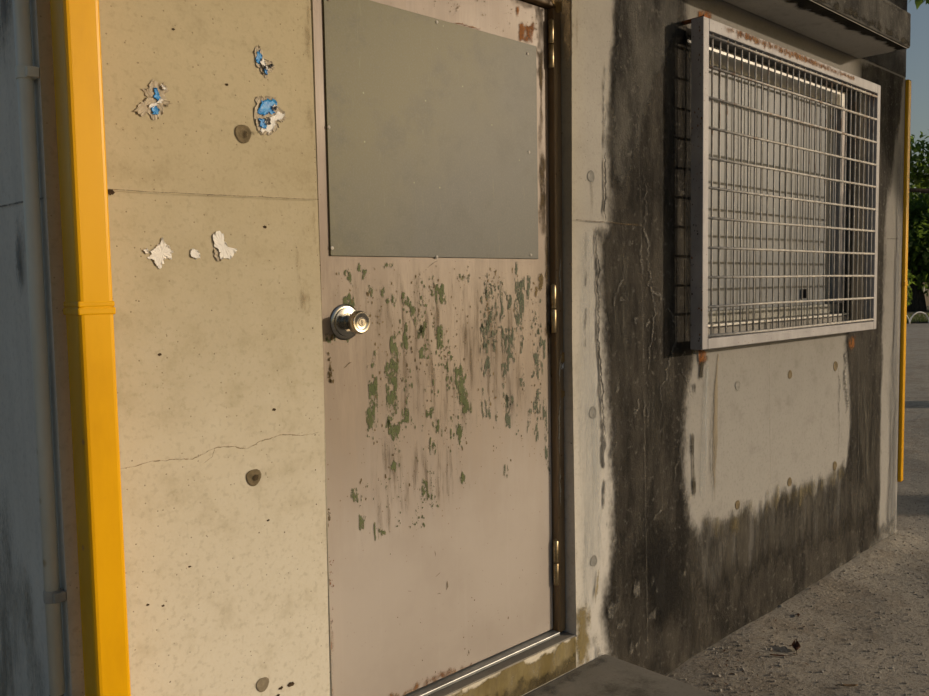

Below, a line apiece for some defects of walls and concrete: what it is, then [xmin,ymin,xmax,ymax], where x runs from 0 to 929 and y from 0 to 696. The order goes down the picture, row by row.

rust [517,7,534,42]
peeling [255,50,273,75]
rust [728,29,855,80]
peeling [257,98,285,133]
peeling [143,238,173,269]
peeling [213,231,237,259]
rust [690,246,706,377]
water stain [455,0,910,696]
peeling [335,249,565,540]